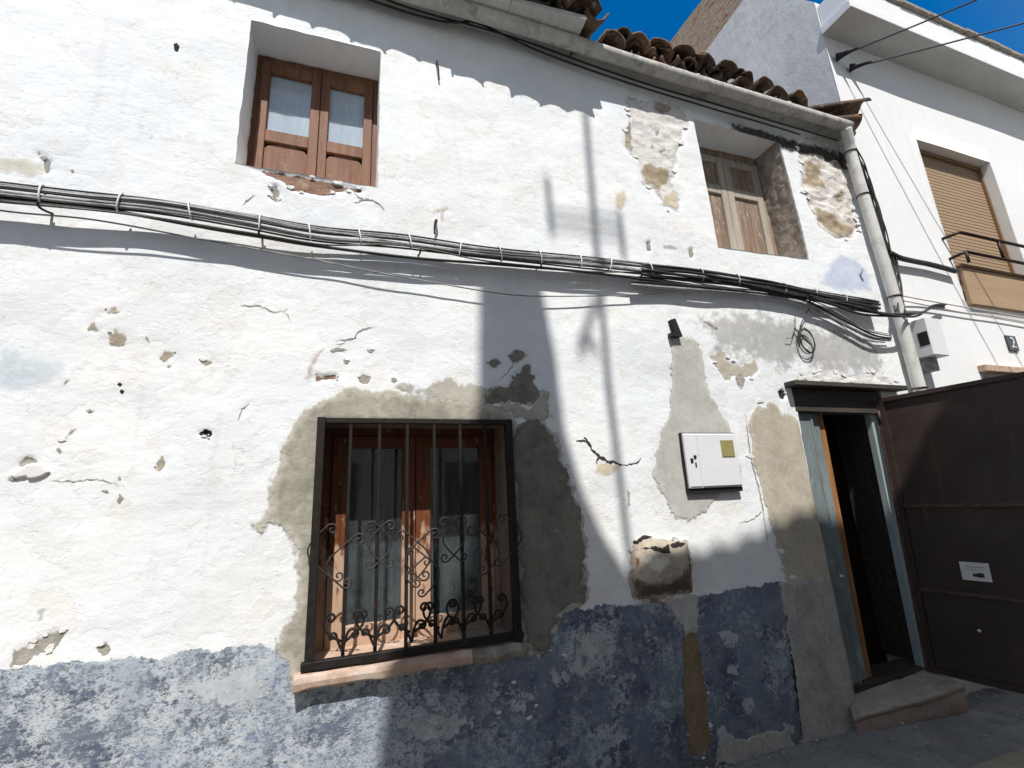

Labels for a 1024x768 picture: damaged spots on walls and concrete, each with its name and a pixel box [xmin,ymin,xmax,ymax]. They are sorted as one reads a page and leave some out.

peeling [622,95,689,212]
flaking render [262,171,361,199]
flaking render [796,135,862,241]
flaking render [484,350,539,410]
peeling [710,347,758,388]
peeling [7,456,50,481]
crack [577,437,641,466]
peeling [10,628,68,670]
flaking render [96,642,110,655]